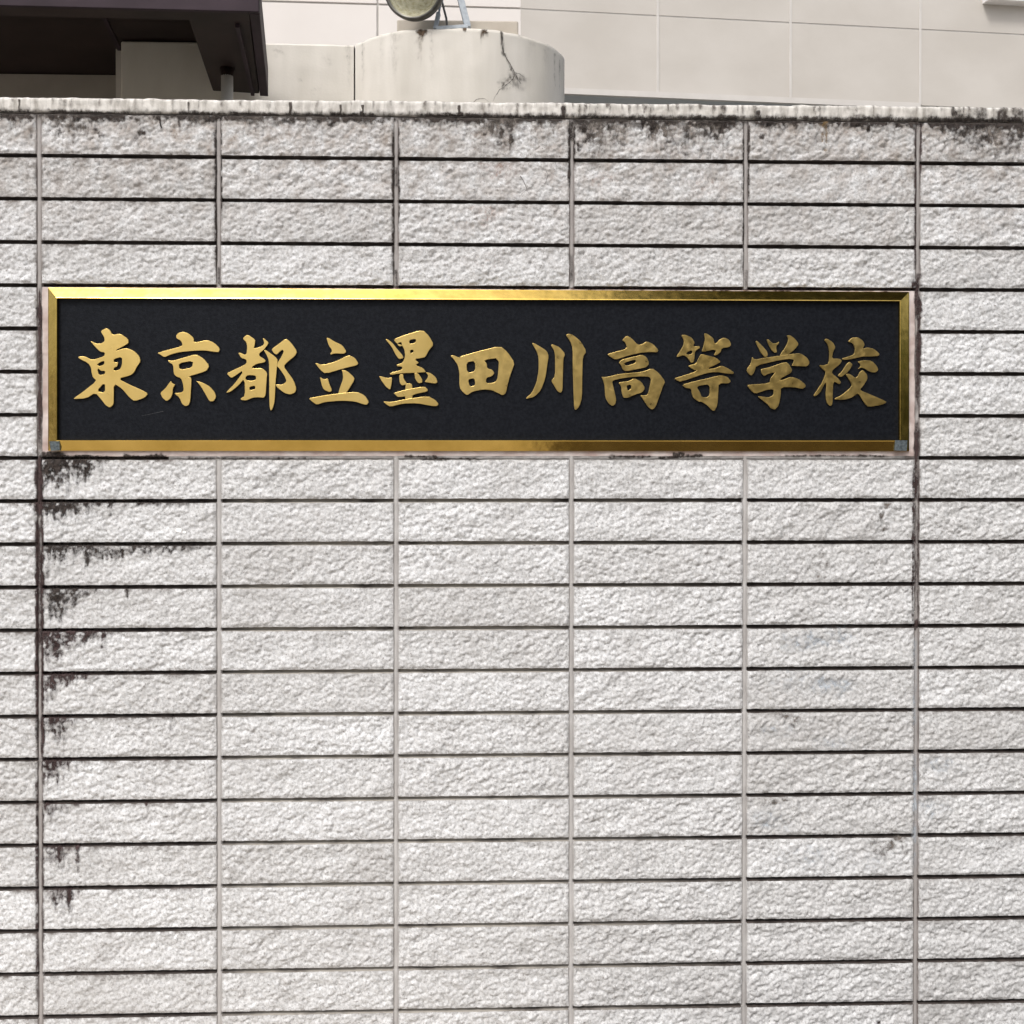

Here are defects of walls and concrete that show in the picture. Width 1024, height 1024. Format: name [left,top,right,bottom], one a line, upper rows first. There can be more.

crack [457,32,521,113]
damp [0,101,1024,402]
damp [30,290,200,970]
damp [910,422,920,630]